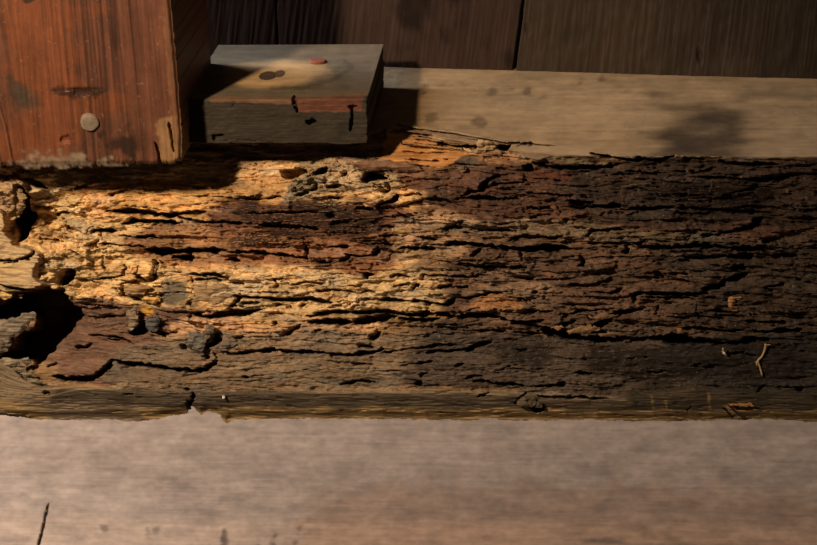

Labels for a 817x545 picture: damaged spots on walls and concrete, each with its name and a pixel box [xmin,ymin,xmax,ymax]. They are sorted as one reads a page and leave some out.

leakage [8,138,136,168]
crack [156,123,175,159]
crack [405,136,779,182]
leakage [661,115,745,163]
crack [0,251,35,264]
crack [0,284,44,292]
spalling [0,186,85,384]
crack [55,175,802,408]